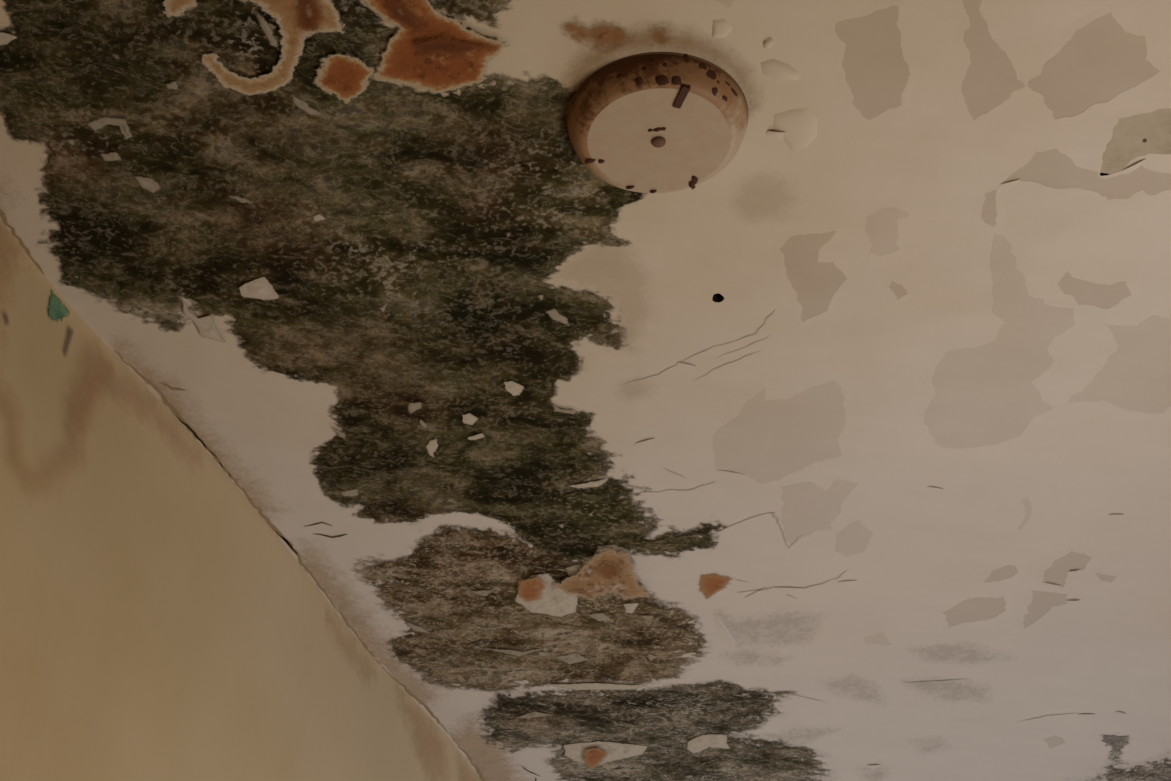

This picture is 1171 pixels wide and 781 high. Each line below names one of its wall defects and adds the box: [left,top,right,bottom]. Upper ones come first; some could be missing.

corrosion [202,0,345,95]
corrosion [313,0,510,104]
peeling [951,0,1171,205]
crack [626,309,776,384]
water stain [0,0,830,781]
corrosion [518,548,650,603]
corrosion [699,574,732,599]
crack [735,571,846,598]
water stain [1093,735,1171,781]